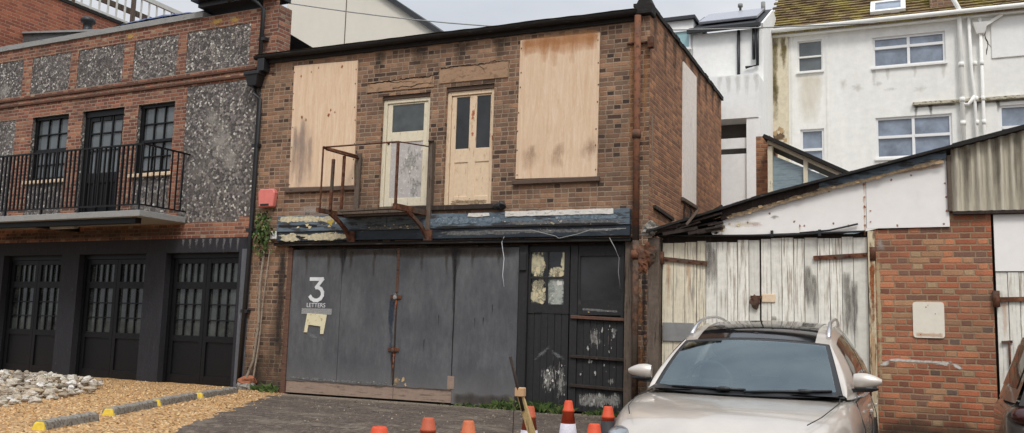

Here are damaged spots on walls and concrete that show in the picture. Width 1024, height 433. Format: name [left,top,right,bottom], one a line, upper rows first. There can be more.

crack [368,60,504,89]
water stain [773,39,786,96]
peeling [278,216,346,242]
peeling [434,198,622,236]
peeling [531,251,565,304]
water stain [844,276,857,316]
peeling [580,326,617,376]
peeling [541,361,565,398]